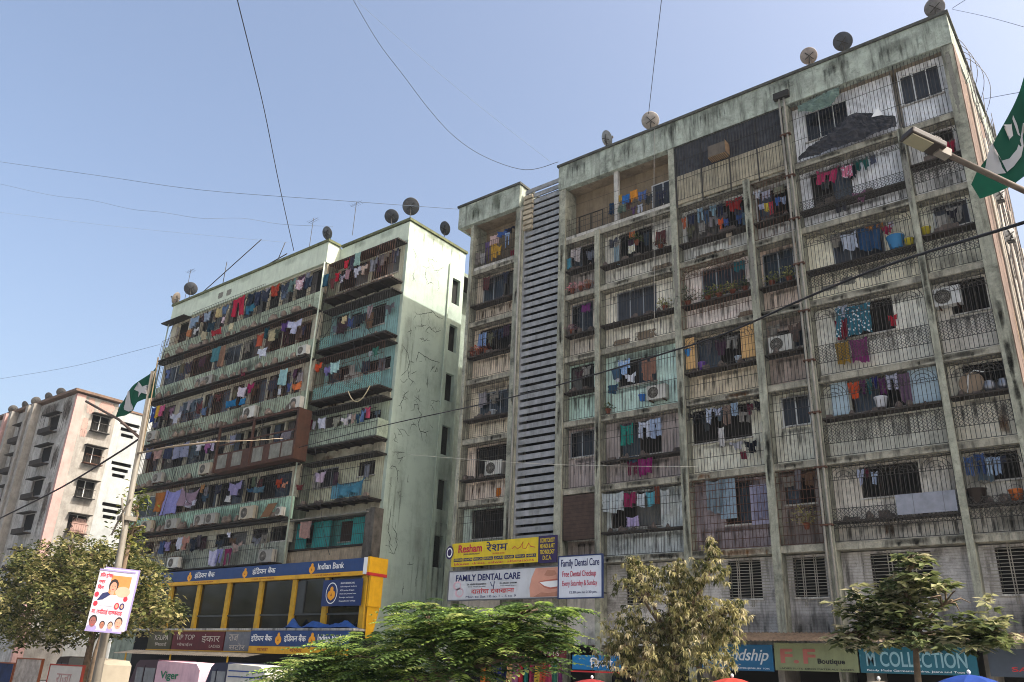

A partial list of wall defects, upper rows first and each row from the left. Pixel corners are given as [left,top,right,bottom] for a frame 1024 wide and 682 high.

crack [386,253,443,595]